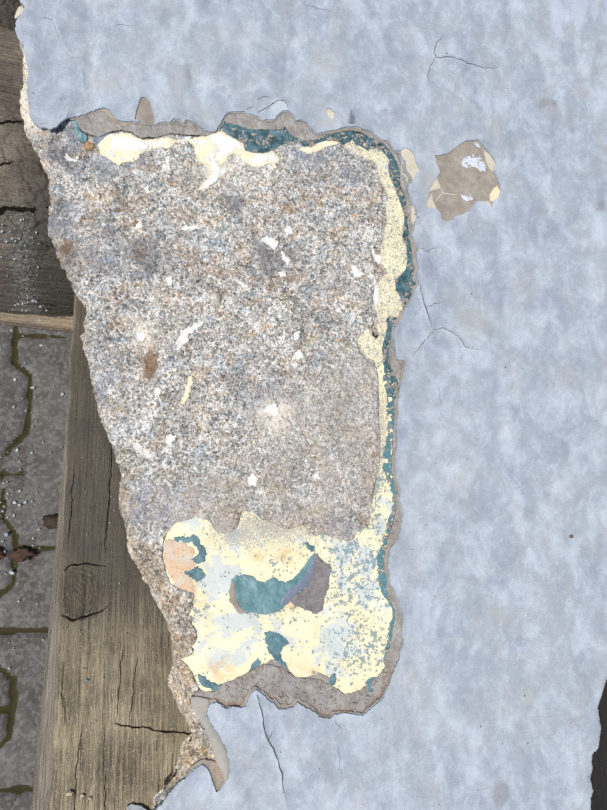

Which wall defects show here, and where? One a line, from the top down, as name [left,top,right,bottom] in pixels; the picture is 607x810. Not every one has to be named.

crack [427,37,493,85]
peeling [426,140,500,221]
crack [414,281,473,353]
spalling [19,41,419,810]
crack [256,694,287,803]